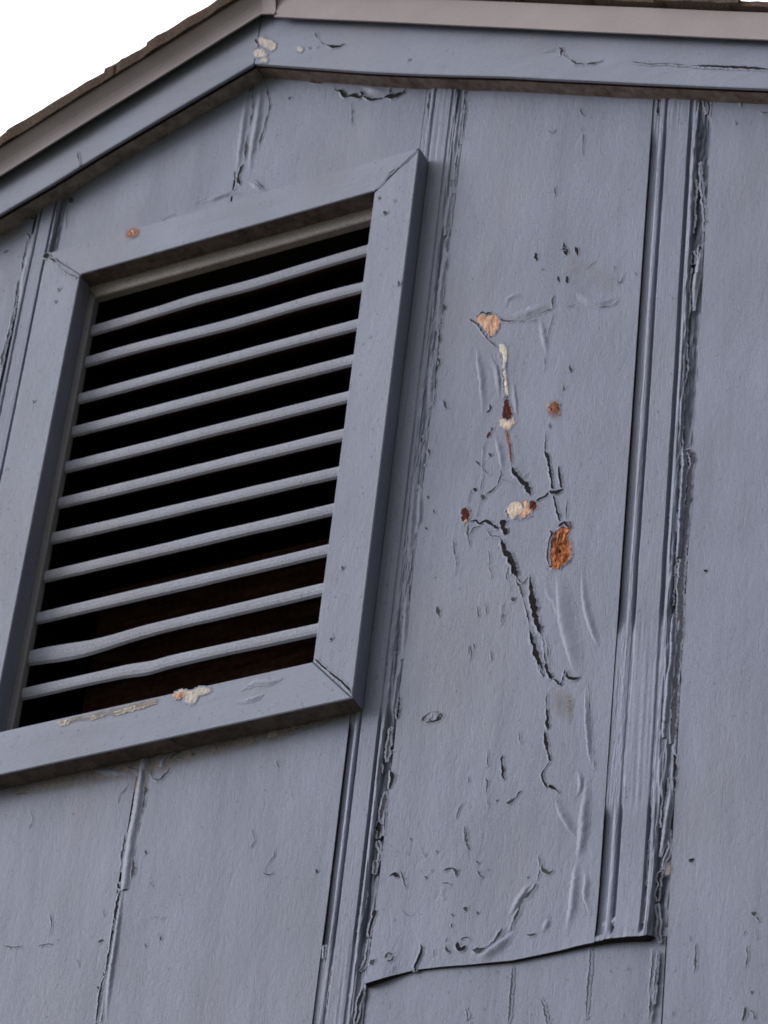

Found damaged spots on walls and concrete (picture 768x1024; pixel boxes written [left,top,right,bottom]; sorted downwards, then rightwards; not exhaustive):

crack [221,77,293,193]
rust [124,228,139,238]
peeling [468,310,516,418]
rust [497,395,517,460]
rust [545,401,562,416]
rust [459,505,472,526]
peeling [504,491,549,521]
peeling [543,519,575,572]
crack [641,101,709,1022]
peeling [172,685,213,706]
crack [322,398,581,1024]
crack [74,780,154,1024]